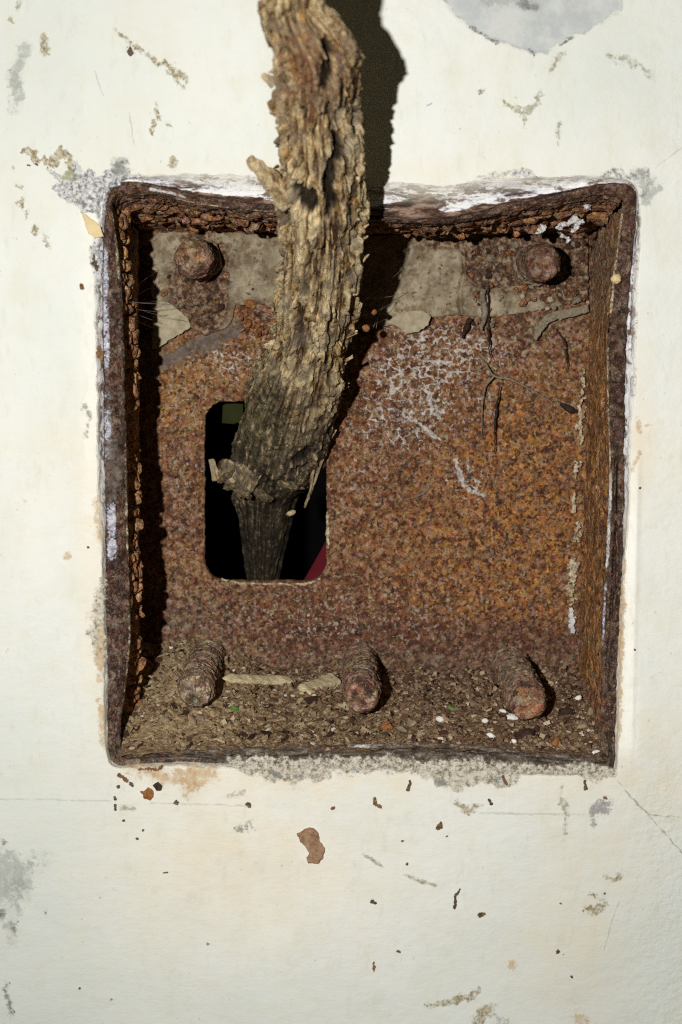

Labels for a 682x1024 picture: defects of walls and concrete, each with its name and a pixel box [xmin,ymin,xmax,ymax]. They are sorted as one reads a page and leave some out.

peeling [443,0,623,56]
flaking render [20,145,233,371]
rust [160,262,230,311]
rust [174,216,270,234]
rust [467,224,581,307]
peeling [104,391,112,460]
peeling [106,475,129,561]
rust [616,586,627,741]